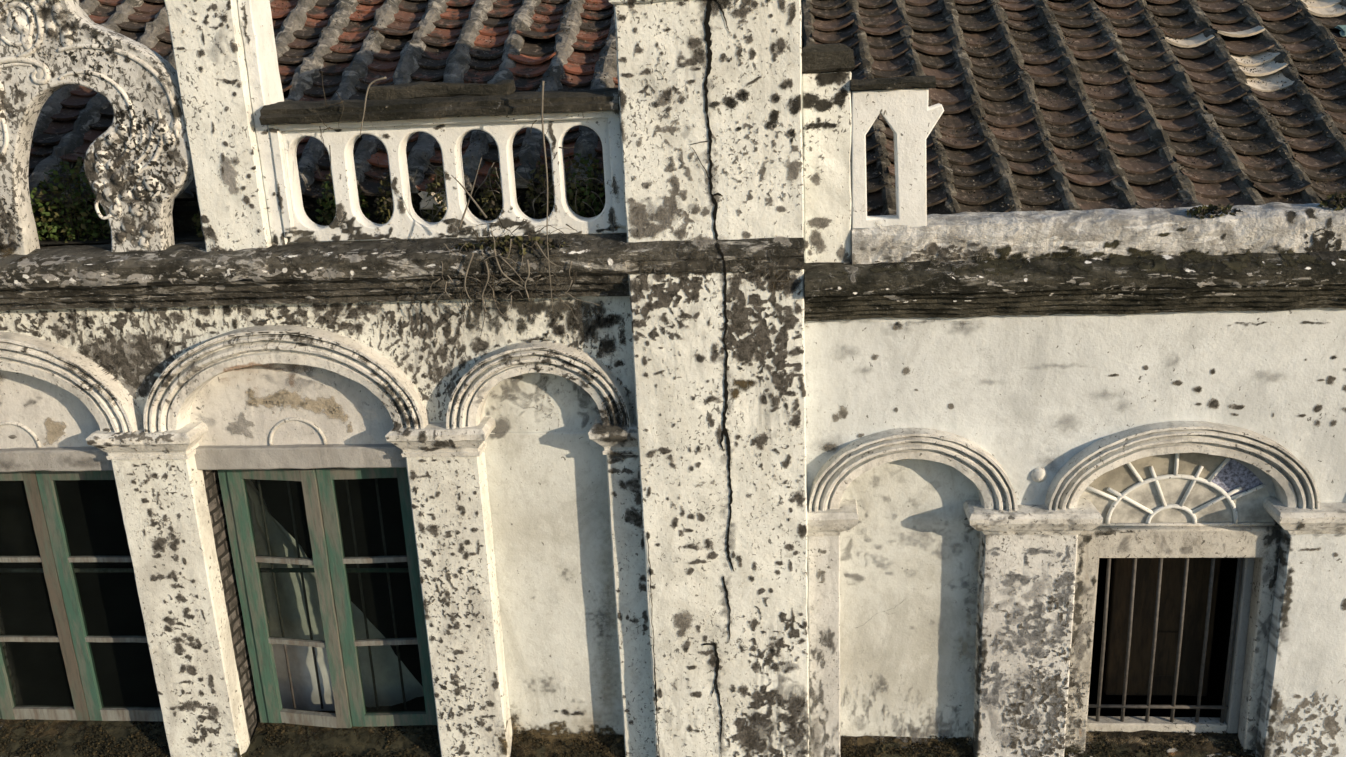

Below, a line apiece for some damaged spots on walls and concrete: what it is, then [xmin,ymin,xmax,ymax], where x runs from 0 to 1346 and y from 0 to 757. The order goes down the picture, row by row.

peeling [0,0,1030,757]
crack [690,0,734,750]
peeling [962,532,1090,757]